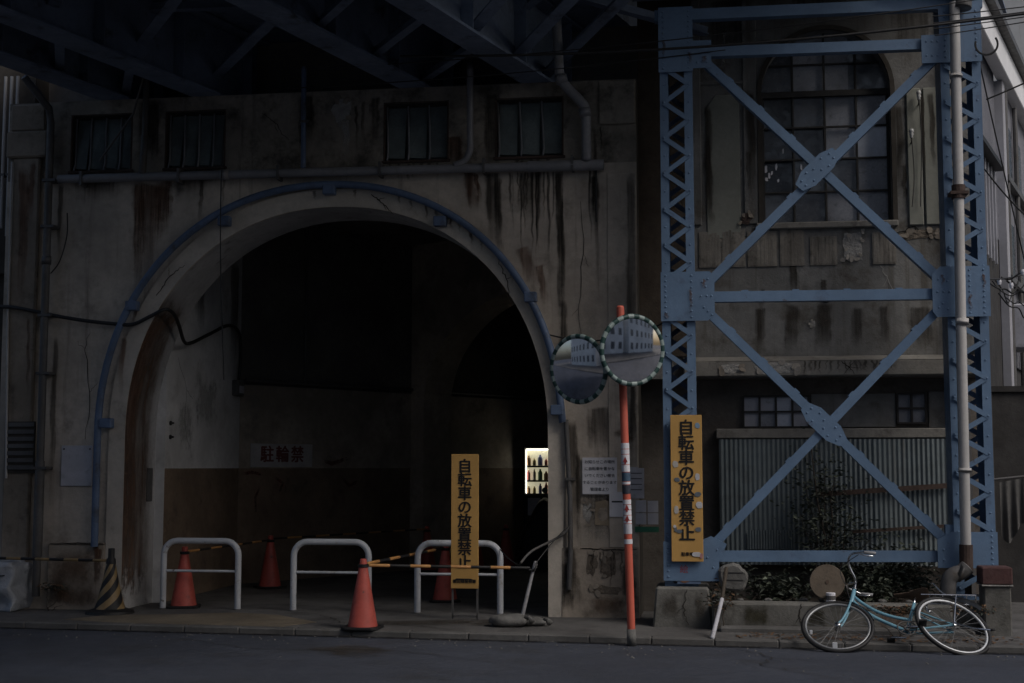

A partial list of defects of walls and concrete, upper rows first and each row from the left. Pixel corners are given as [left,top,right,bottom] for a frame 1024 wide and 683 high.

leakage [486,159,565,264]
peeling [840,228,865,262]